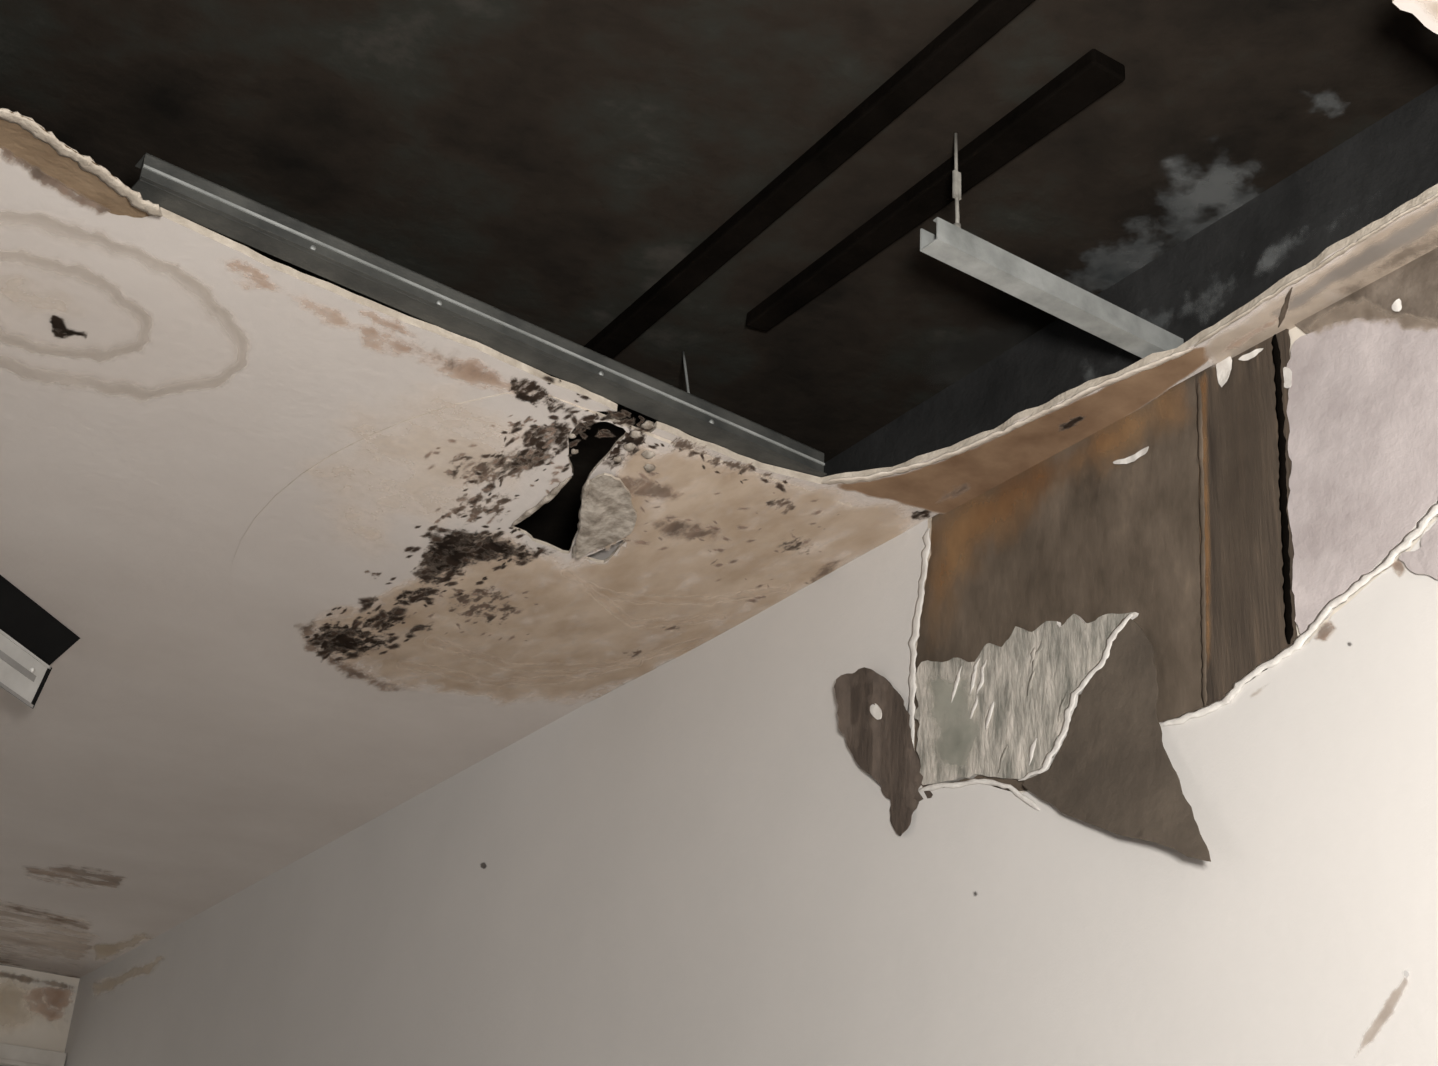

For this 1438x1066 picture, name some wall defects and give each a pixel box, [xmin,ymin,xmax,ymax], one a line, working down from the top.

leakage [1316,94,1340,109]
leakage [1074,159,1257,289]
leakage [0,213,246,399]
leakage [300,193,1438,701]
peeling [834,247,1438,862]
leakage [28,867,124,888]
leakage [0,906,161,1021]